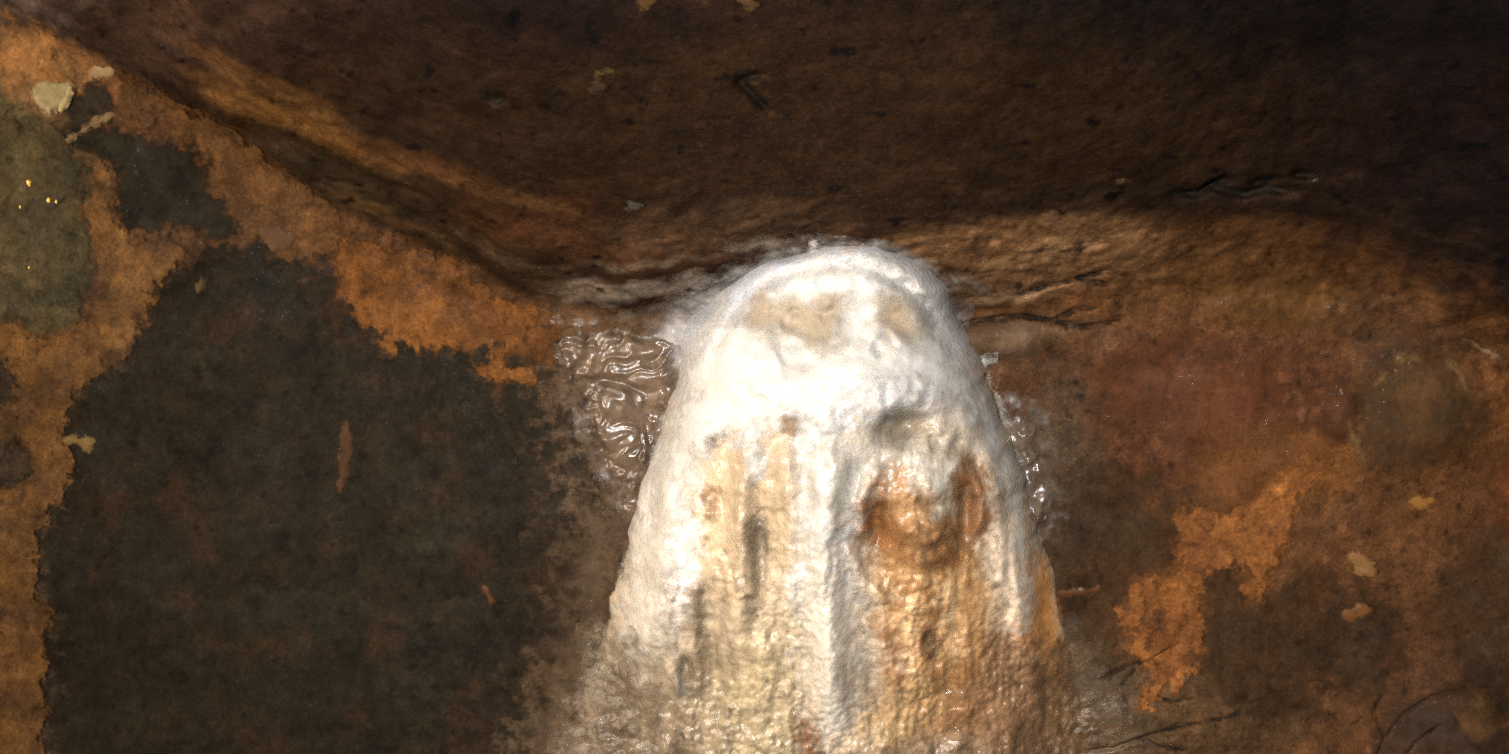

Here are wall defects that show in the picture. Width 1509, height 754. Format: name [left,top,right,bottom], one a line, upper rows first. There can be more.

rust [0,13,65,94]
water stain [529,239,1123,754]